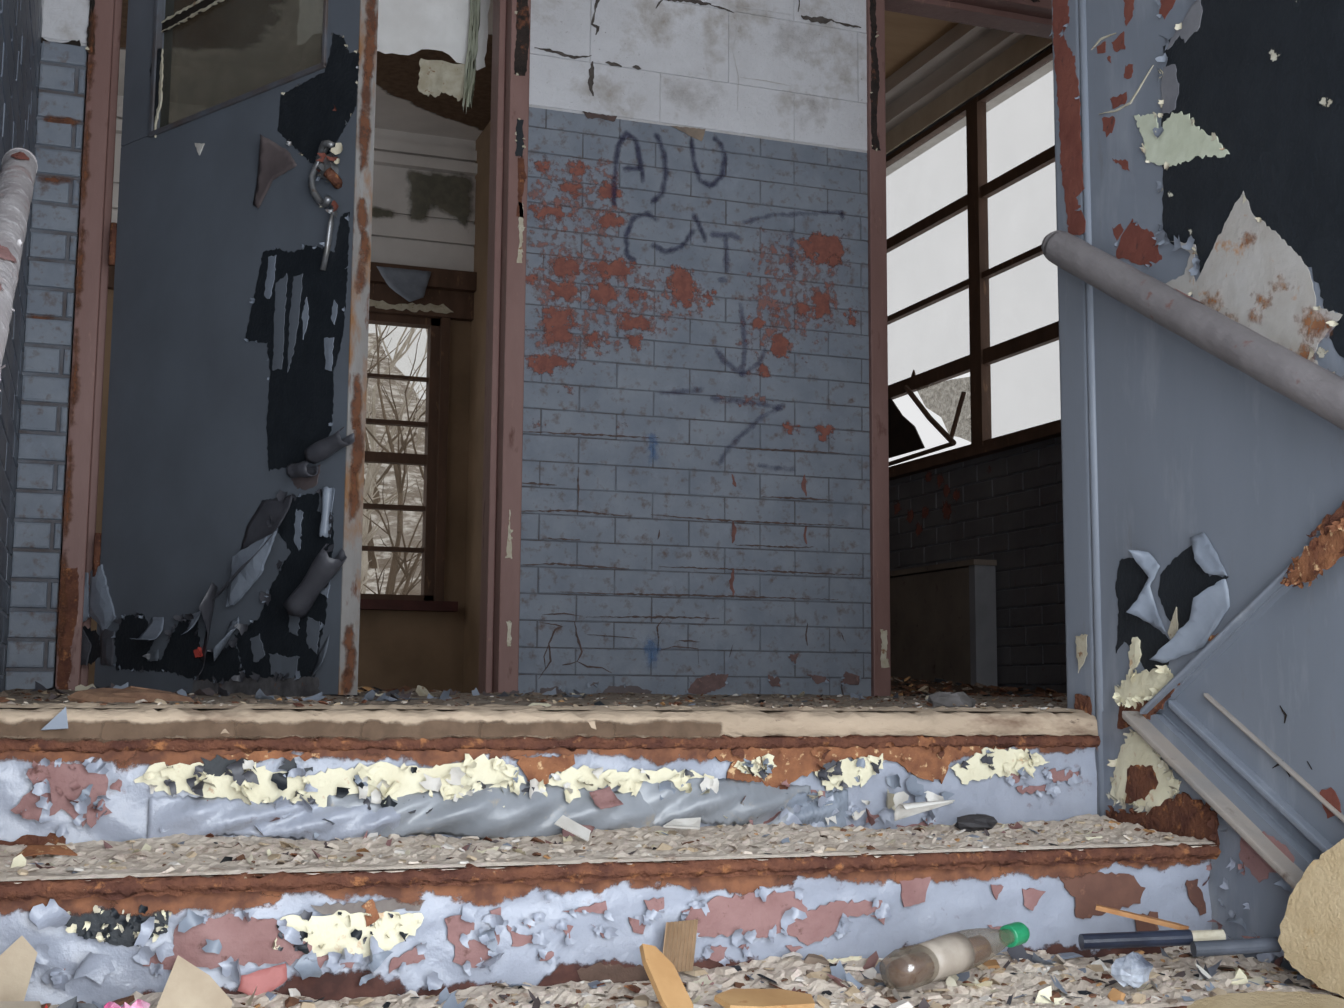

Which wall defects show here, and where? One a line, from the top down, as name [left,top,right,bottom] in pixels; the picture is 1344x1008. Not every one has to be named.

rust [359,0,377,170]
peeling [1097,0,1344,365]
rust [1280,501,1344,589]
peeling [1115,532,1230,672]
peeling [11,754,719,857]
rust [0,634,1220,931]
peeling [733,747,1083,829]
peeling [29,899,443,995]
rust [273,969,501,1001]
rust [537,958,648,986]
peeling [445,877,931,976]
rust [1024,941,1173,958]